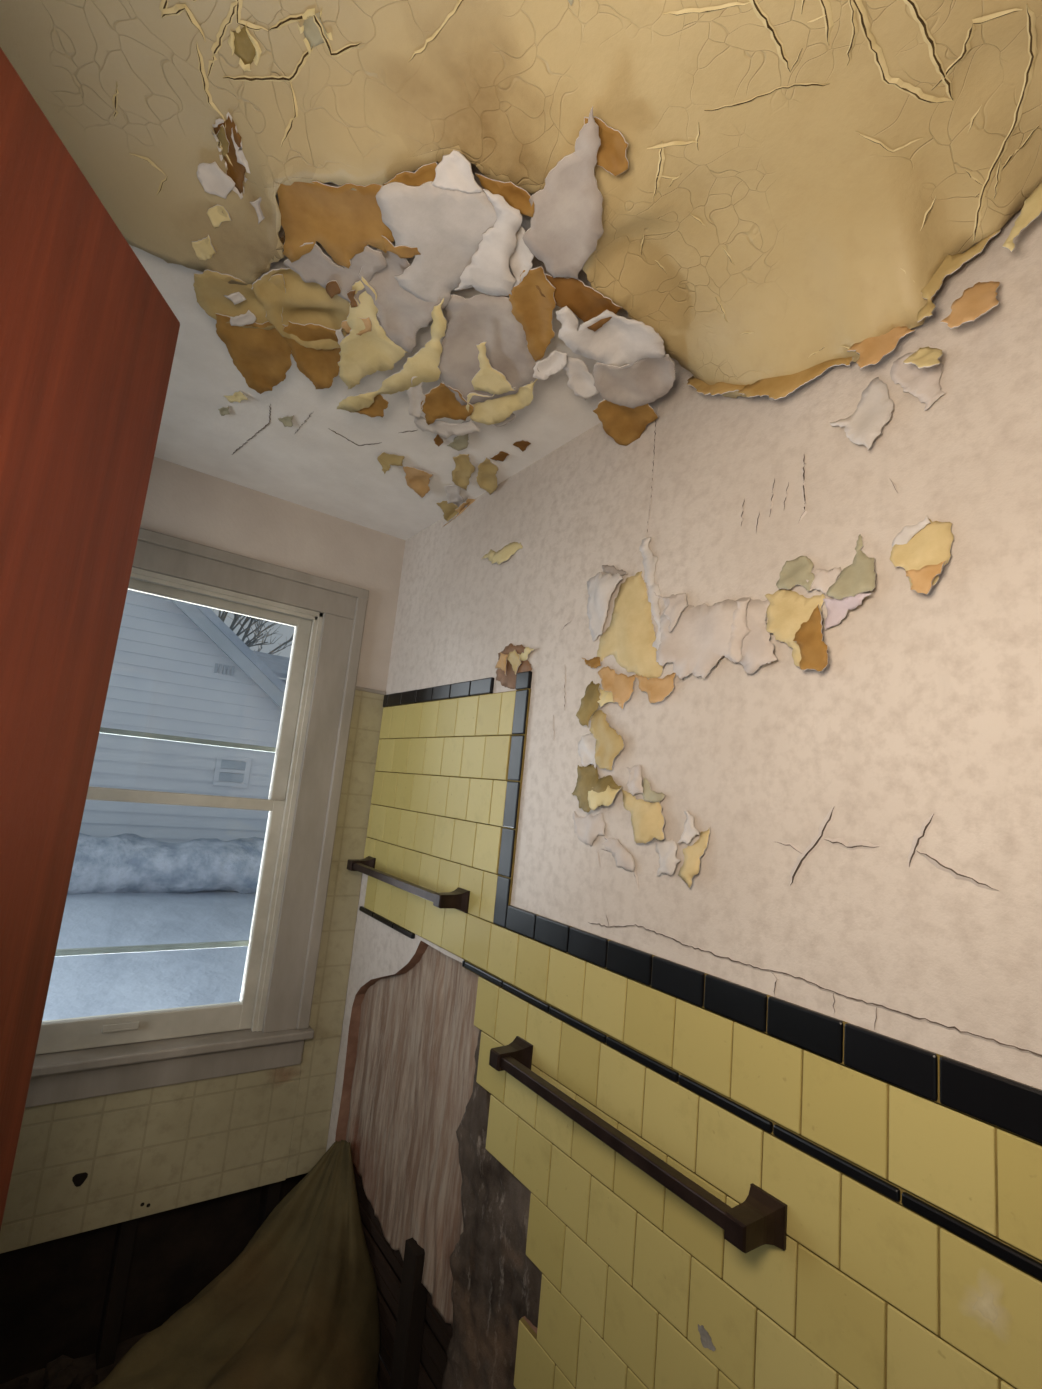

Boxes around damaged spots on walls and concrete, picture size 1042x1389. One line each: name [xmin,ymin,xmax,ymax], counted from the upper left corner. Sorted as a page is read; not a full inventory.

crack [111,81,119,120]
crack [159,0,361,166]
crack [408,0,464,62]
peeling [0,0,1042,527]
peeling [495,643,534,689]
peeling [572,516,954,888]
crack [773,806,999,891]
crack [588,915,1042,1058]
spalling [279,1173,308,1202]
spalling [0,1223,118,1384]
spalling [118,1186,262,1344]